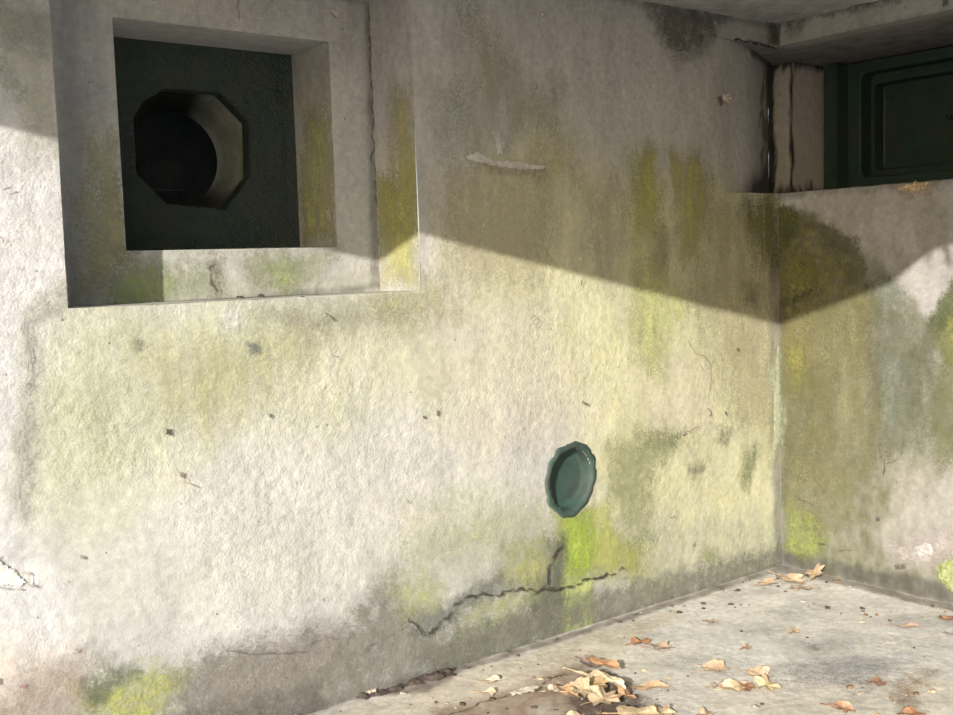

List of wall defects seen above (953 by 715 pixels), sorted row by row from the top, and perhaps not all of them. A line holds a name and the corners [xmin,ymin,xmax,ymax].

damp [633,147,825,434]
damp [872,276,953,473]
spalling [0,561,36,590]
crack [408,546,628,638]